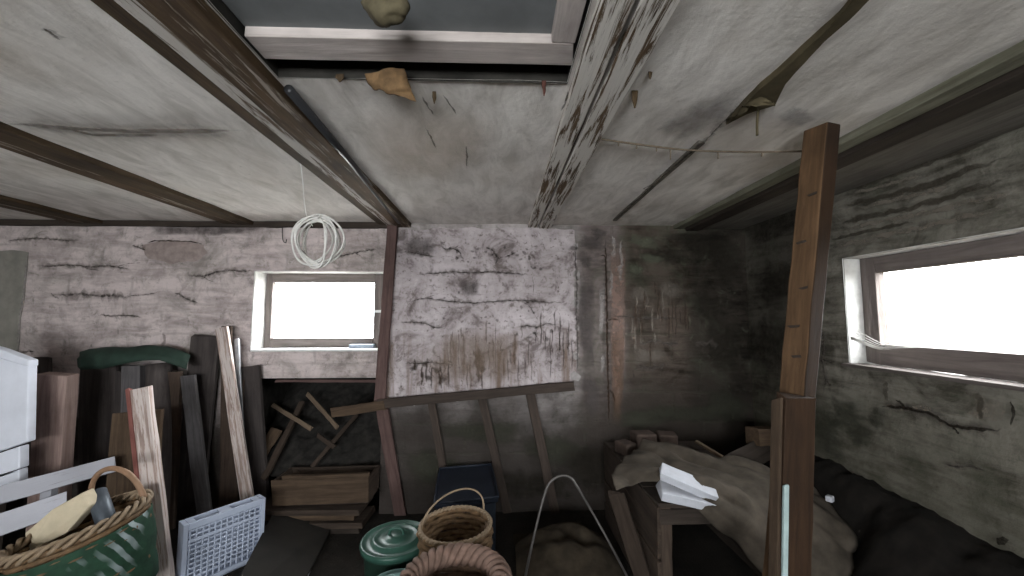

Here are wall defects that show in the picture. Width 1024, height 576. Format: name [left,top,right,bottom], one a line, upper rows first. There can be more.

crack [408,246,550,333]
water stain [579,287,604,362]
crack [883,400,1015,434]